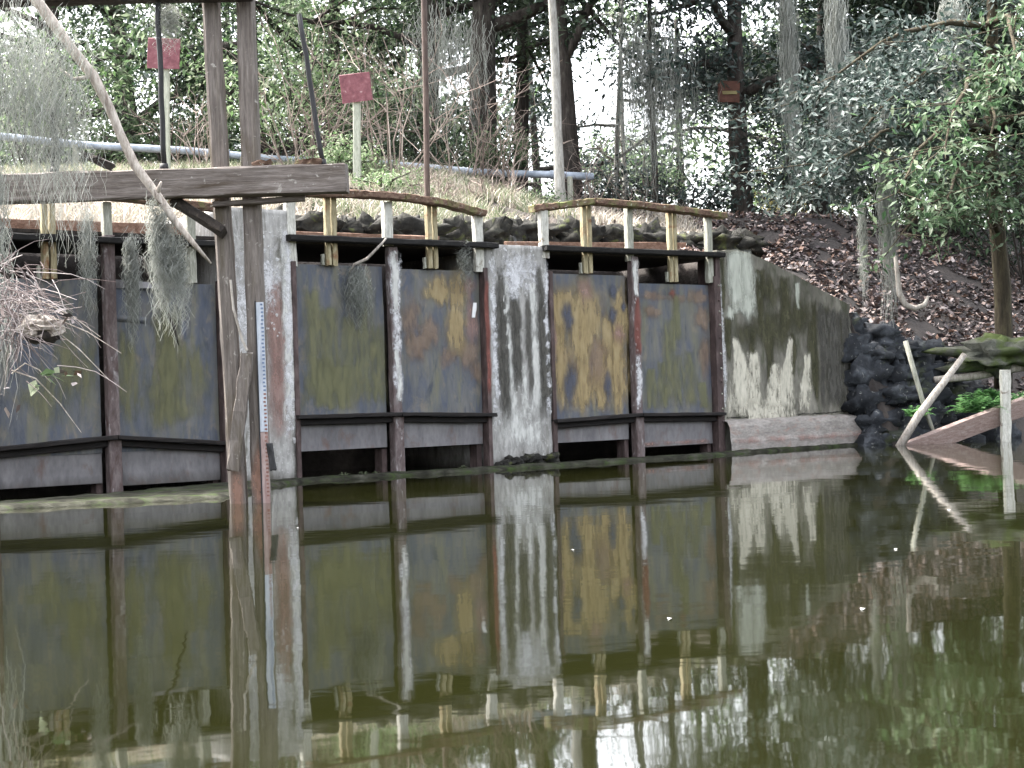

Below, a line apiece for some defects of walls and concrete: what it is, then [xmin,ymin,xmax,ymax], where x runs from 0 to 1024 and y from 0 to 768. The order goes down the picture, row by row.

water stain [494,268,553,445]
corrosion [553,285,707,413]
water stain [727,251,755,319]
water stain [728,283,849,419]